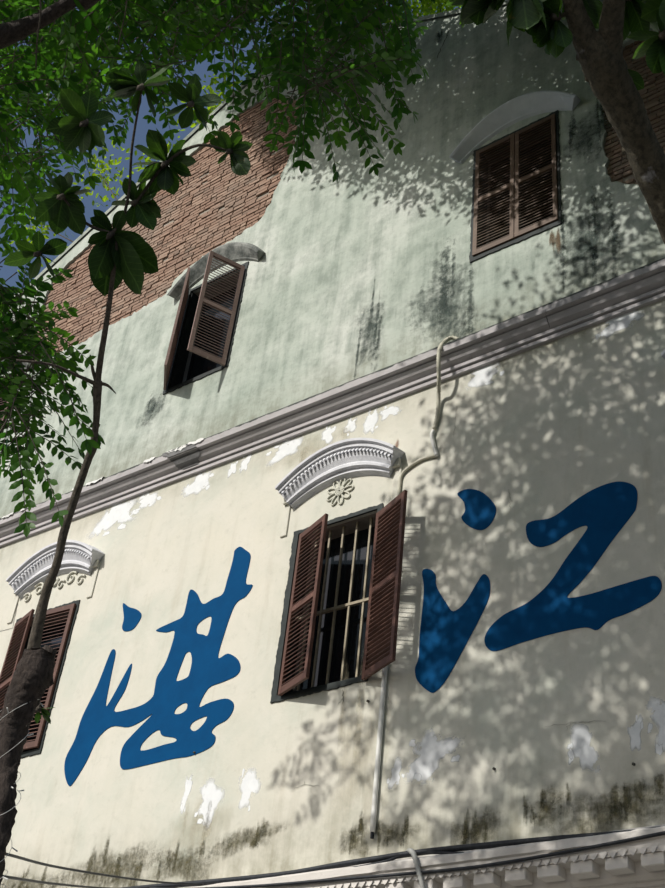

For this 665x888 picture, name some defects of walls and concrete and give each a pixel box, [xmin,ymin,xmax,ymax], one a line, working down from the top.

water stain [561,198,618,279]
water stain [420,254,473,342]
peeling [595,310,643,339]
peeling [468,362,505,388]
peeling [322,406,400,444]
peeling [90,492,161,537]
peeling [387,730,460,788]
peeling [180,775,224,825]
water stain [579,775,663,834]
water stain [222,823,278,852]
water stain [73,842,148,886]
water stain [157,843,204,881]